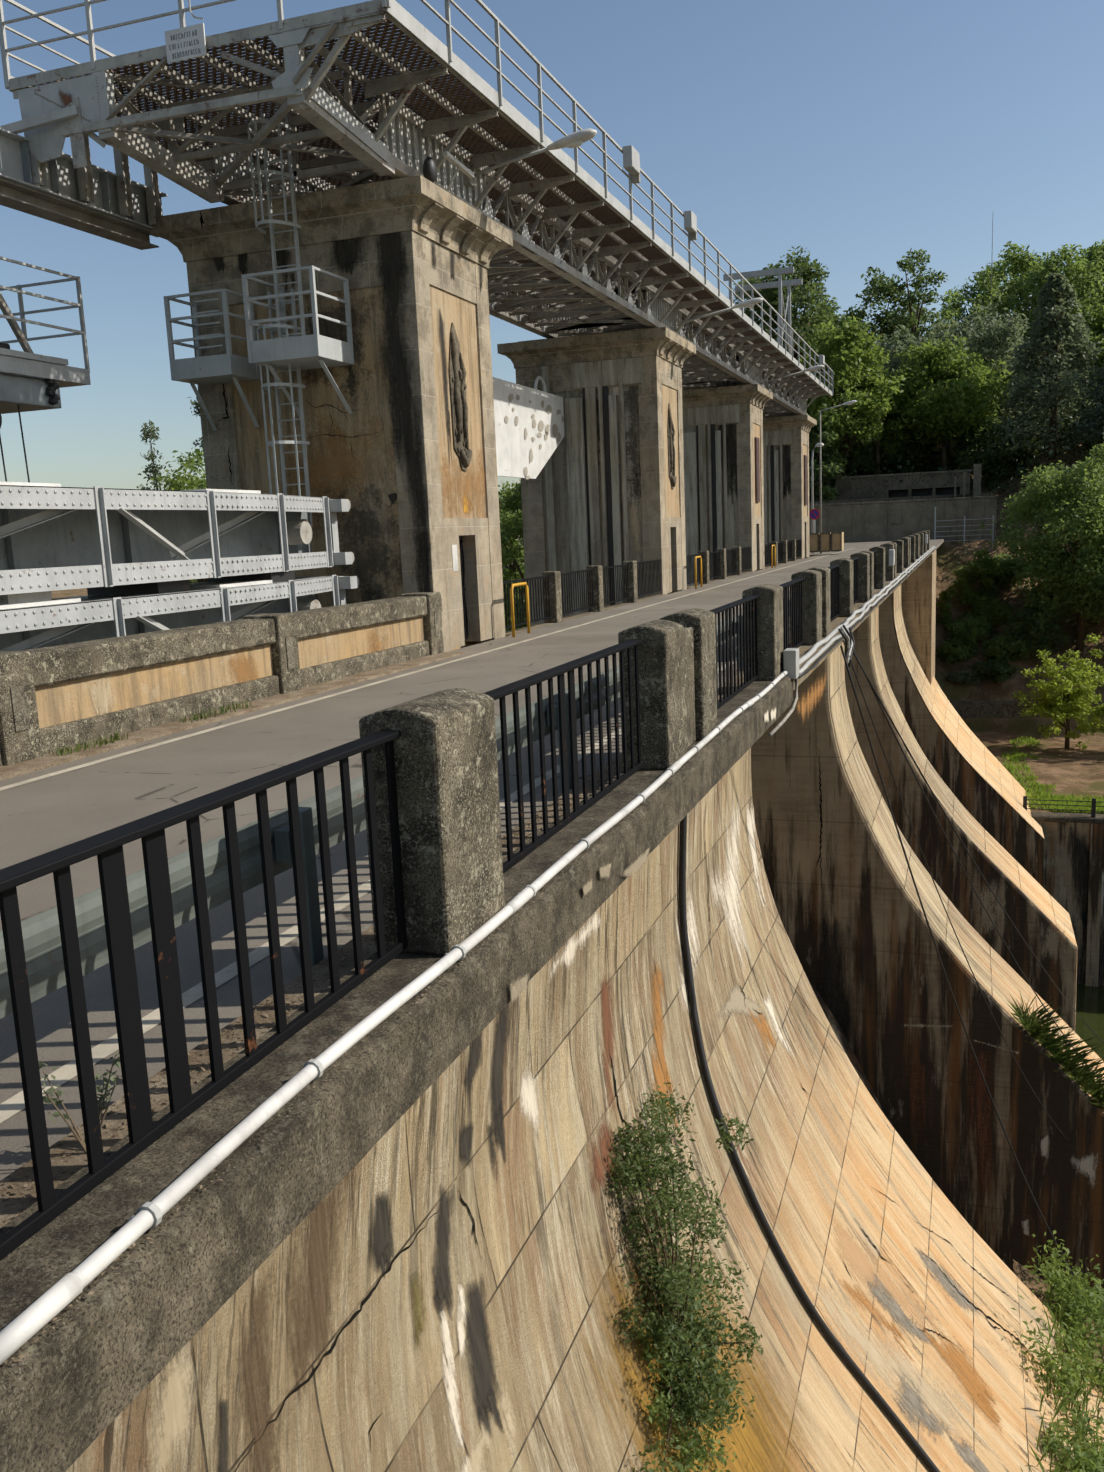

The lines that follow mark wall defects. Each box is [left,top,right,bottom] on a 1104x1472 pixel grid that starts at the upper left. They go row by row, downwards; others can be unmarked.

leakage [276,232,431,604]
leakage [439,311,452,462]
leakage [579,385,643,553]
leakage [817,919,857,1048]
leakage [371,1194,394,1277]
leakage [1071,1155,1098,1184]
crack [235,1191,480,1472]
leakage [433,1189,515,1472]